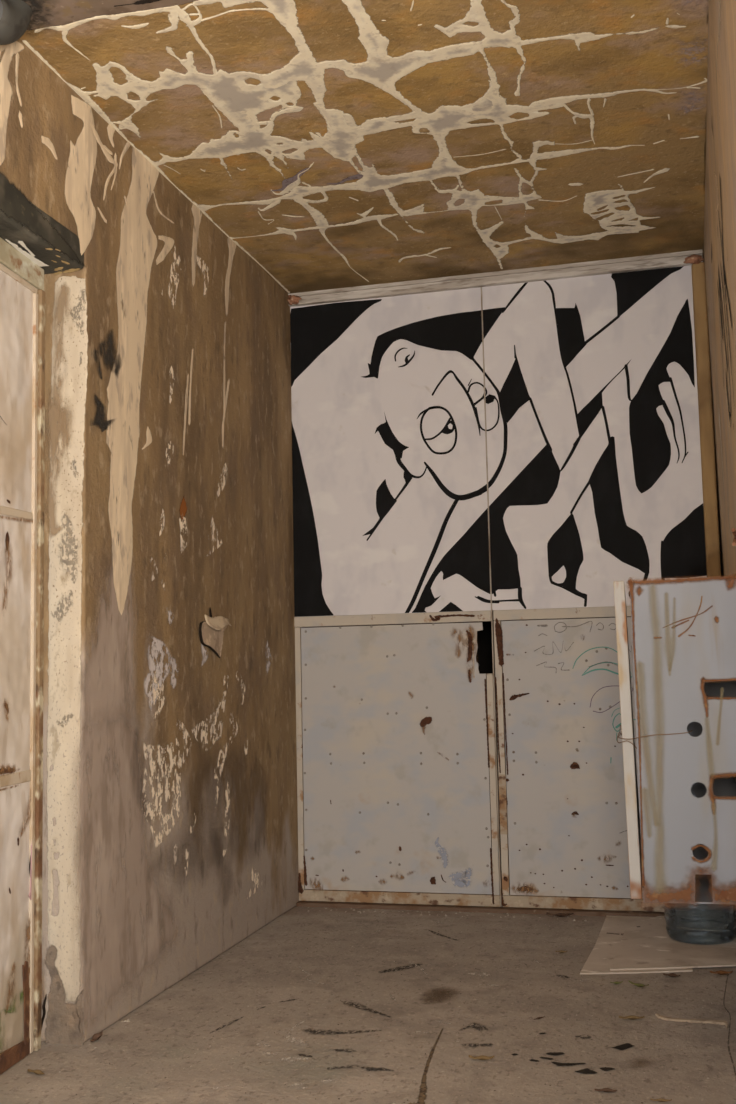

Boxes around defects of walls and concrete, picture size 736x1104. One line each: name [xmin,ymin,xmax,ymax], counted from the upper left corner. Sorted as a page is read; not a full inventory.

flaking render [0,0,707,616]
flaking render [44,248,88,1045]
flaking render [142,671,248,875]
flaking render [202,616,228,657]
corrosion [429,614,475,683]
corrosion [484,618,530,782]
corrosion [298,856,323,894]
corrosion [490,848,555,906]